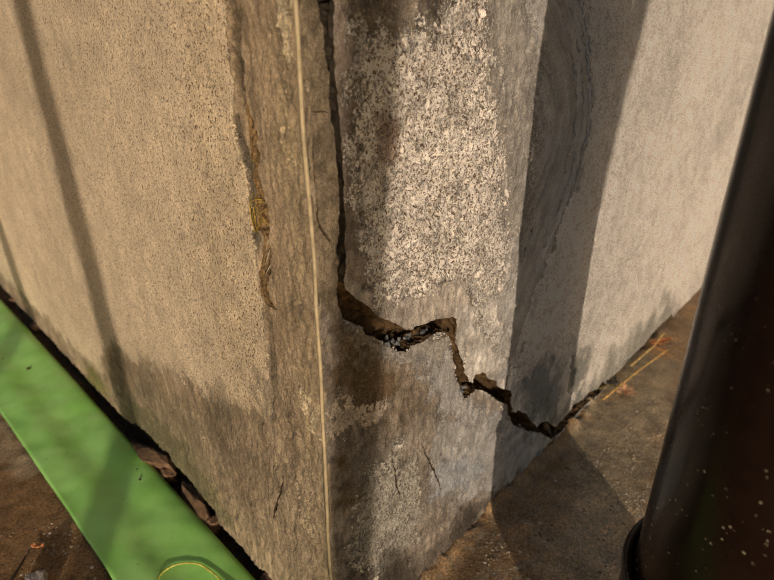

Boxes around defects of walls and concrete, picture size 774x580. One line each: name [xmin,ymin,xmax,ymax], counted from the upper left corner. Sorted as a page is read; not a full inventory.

crack [245,97,277,311]
peeling [340,0,517,314]
crack [311,0,607,439]
crack [273,476,284,519]